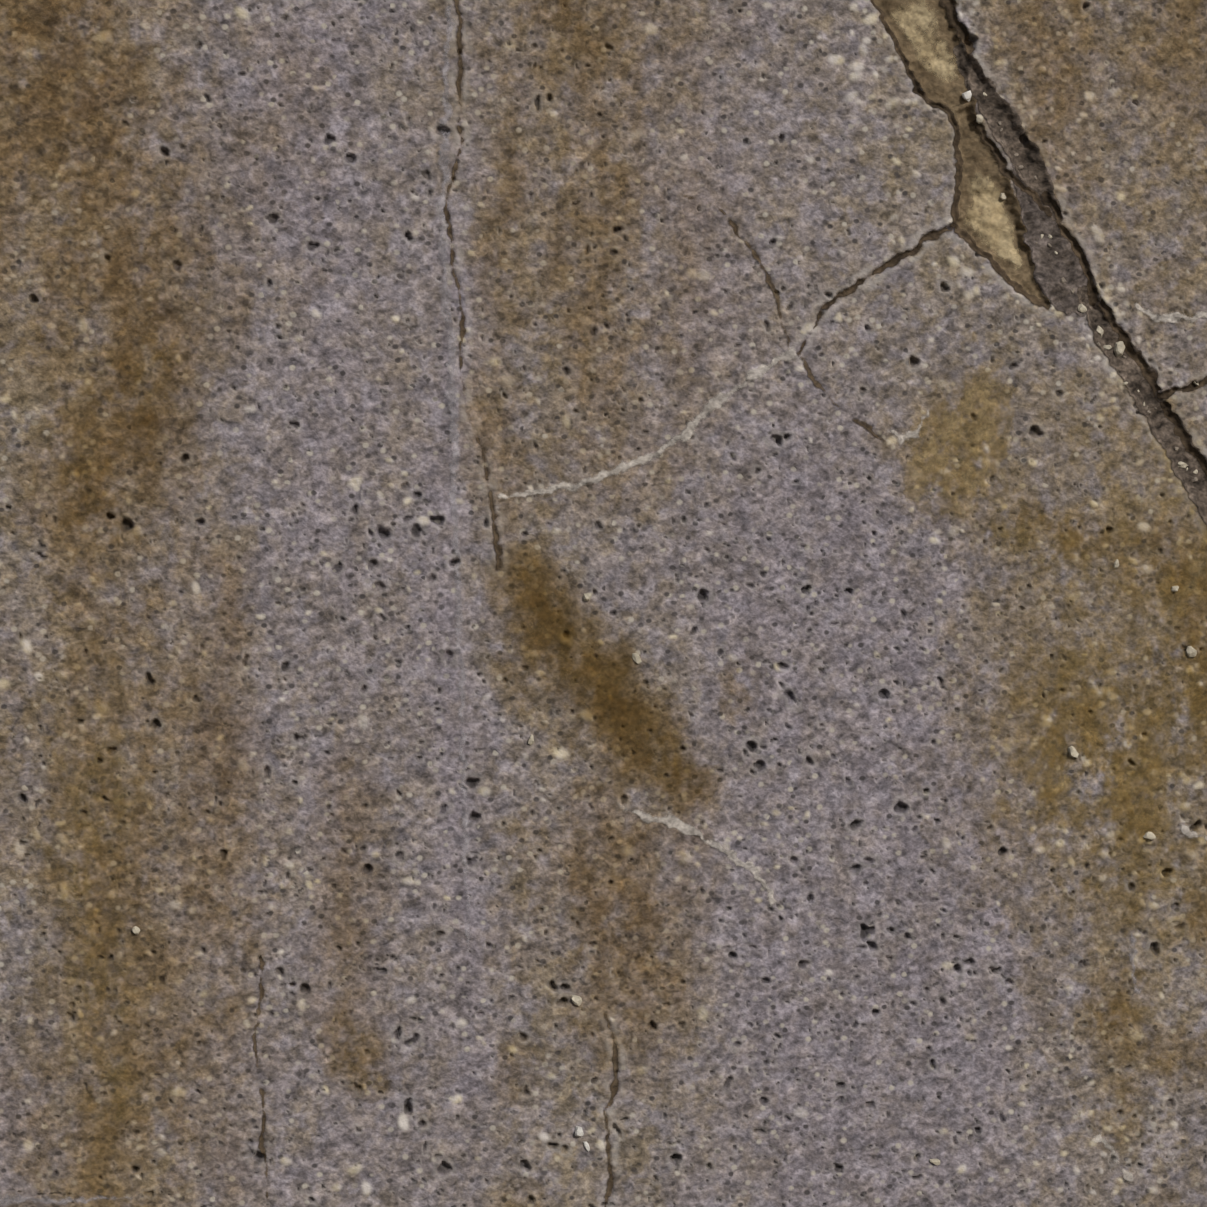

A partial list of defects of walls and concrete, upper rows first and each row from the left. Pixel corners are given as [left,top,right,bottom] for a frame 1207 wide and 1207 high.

crack [444,0,466,388]
crack [719,0,1207,525]
crack [476,437,502,570]
damp [892,410,929,442]
crack [604,1014,619,1207]